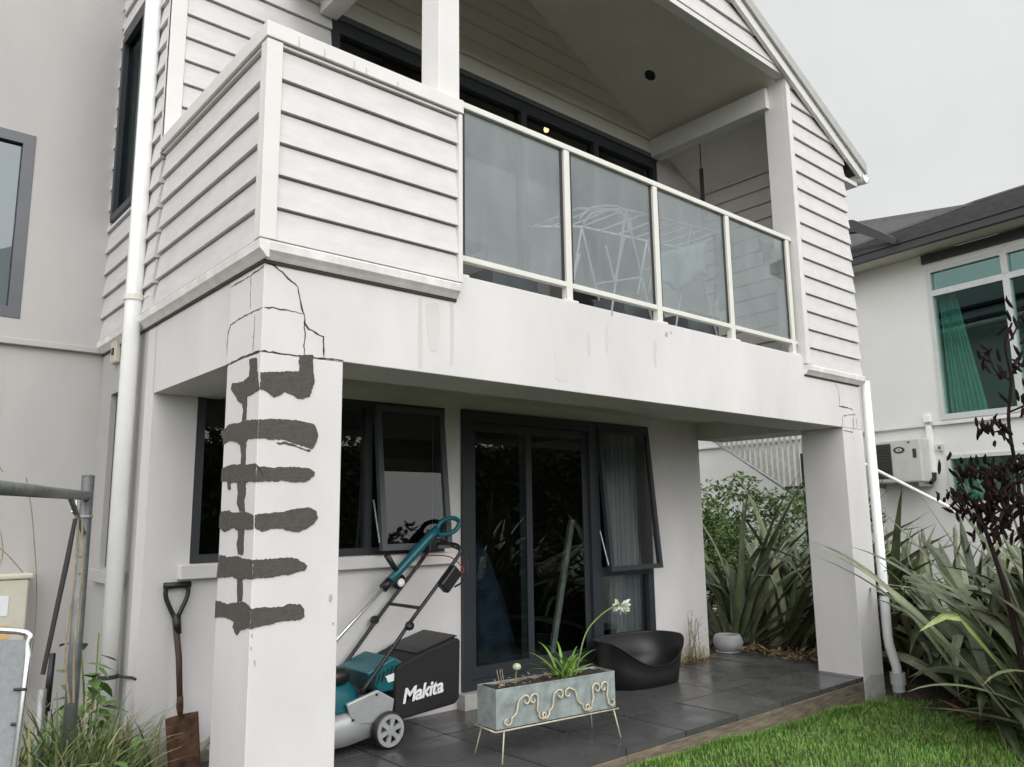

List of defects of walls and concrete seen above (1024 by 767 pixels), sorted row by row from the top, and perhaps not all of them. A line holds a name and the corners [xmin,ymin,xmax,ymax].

crack [226,263,344,367]
crack [835,384,857,438]